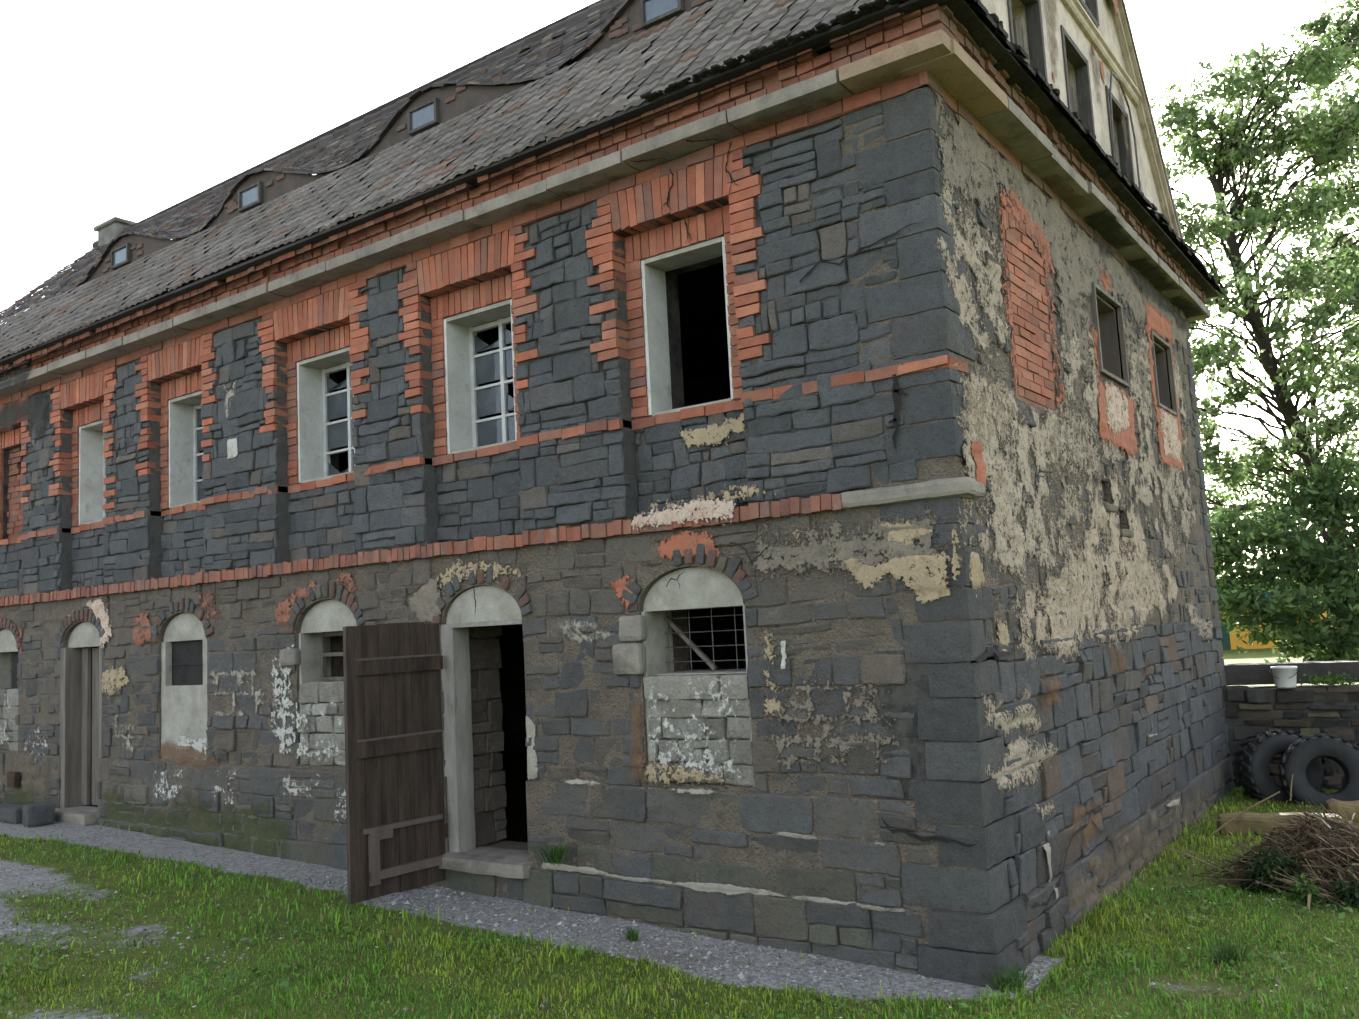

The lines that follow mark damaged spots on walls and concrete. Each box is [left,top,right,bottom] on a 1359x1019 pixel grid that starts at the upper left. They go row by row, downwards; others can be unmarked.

peeling [673,413,745,448]
peeling [744,87,1215,820]
peeling [631,483,777,561]
peeling [68,596,112,648]
flaking render [274,570,364,627]
flaking render [607,571,634,615]
peeling [101,665,129,698]
peeling [209,644,345,798]
peeling [648,678,741,778]
peeling [152,767,186,801]
peeling [212,770,236,804]
peeling [334,789,346,825]